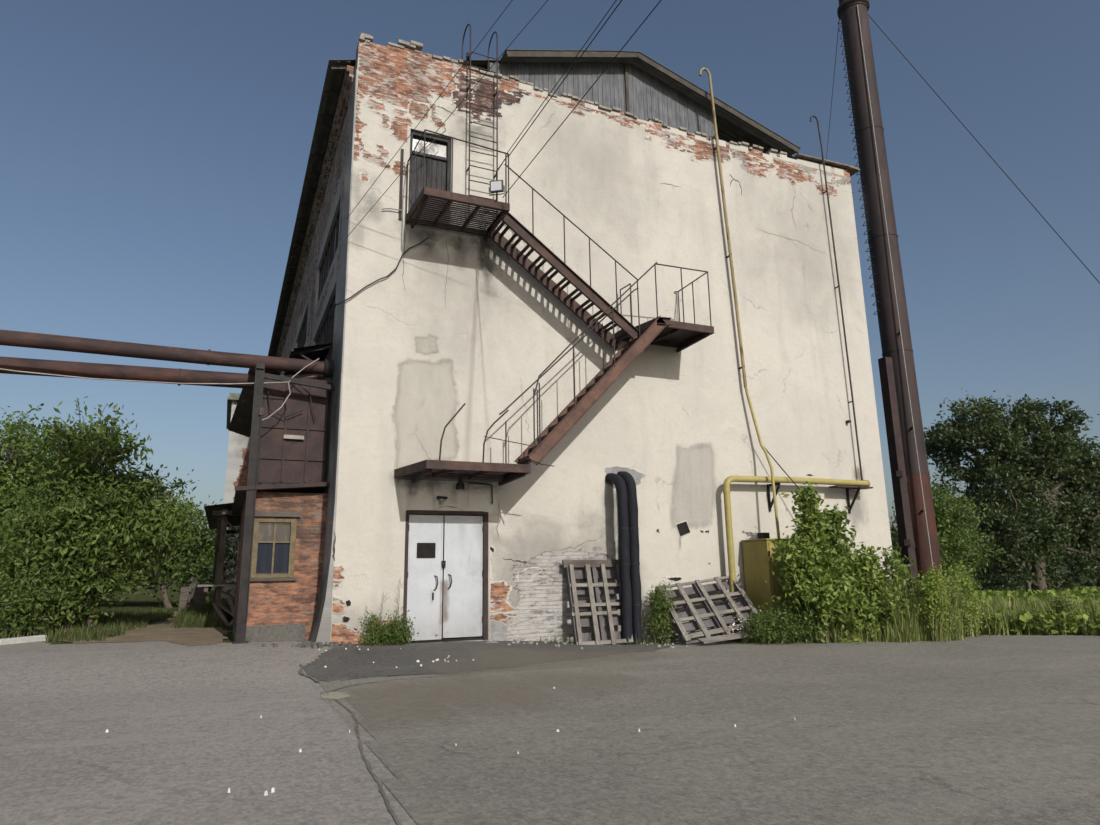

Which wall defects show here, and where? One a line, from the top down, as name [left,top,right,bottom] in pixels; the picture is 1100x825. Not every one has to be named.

flaking render [281,44,849,358]
flaking render [232,448,261,499]
leakage [313,580,323,626]
peeling [488,545,617,642]